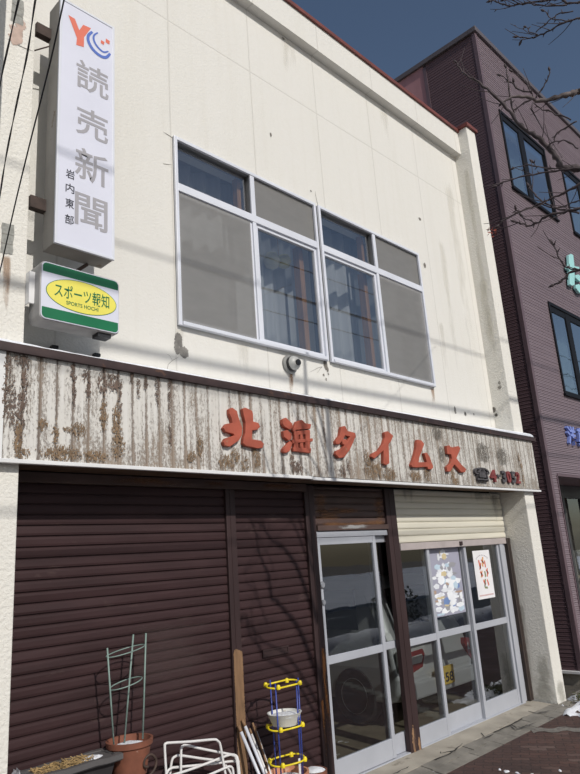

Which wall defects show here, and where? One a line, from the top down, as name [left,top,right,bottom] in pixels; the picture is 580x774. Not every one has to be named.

peeling [174,332,189,358]